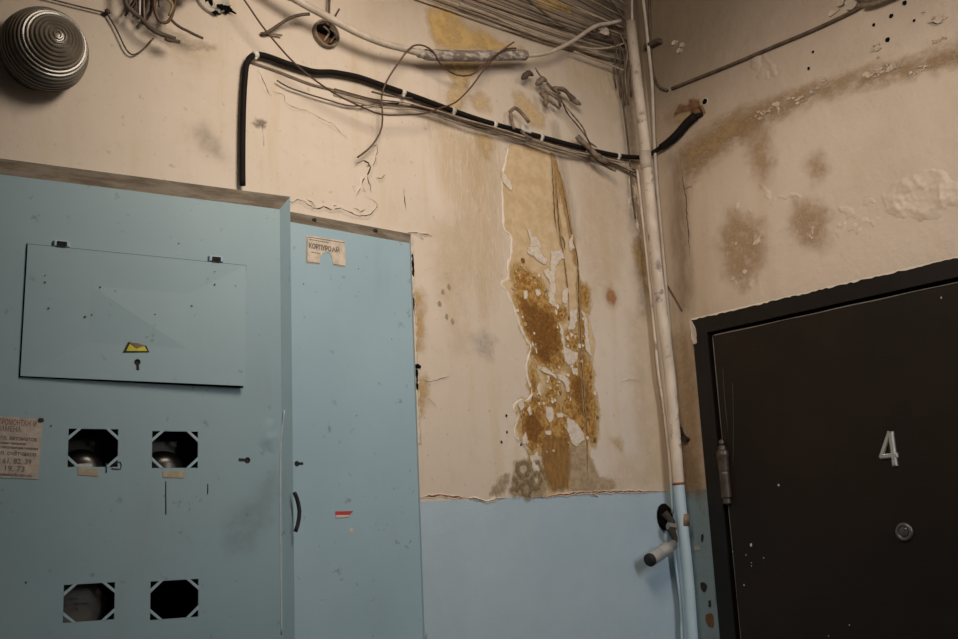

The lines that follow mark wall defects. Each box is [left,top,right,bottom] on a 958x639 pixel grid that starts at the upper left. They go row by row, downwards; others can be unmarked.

leakage [428,8,509,50]
crack [257,69,348,139]
leakage [685,51,958,173]
crack [290,143,433,240]
peeling [500,144,599,496]
mould [491,456,545,500]
leakage [570,445,614,492]